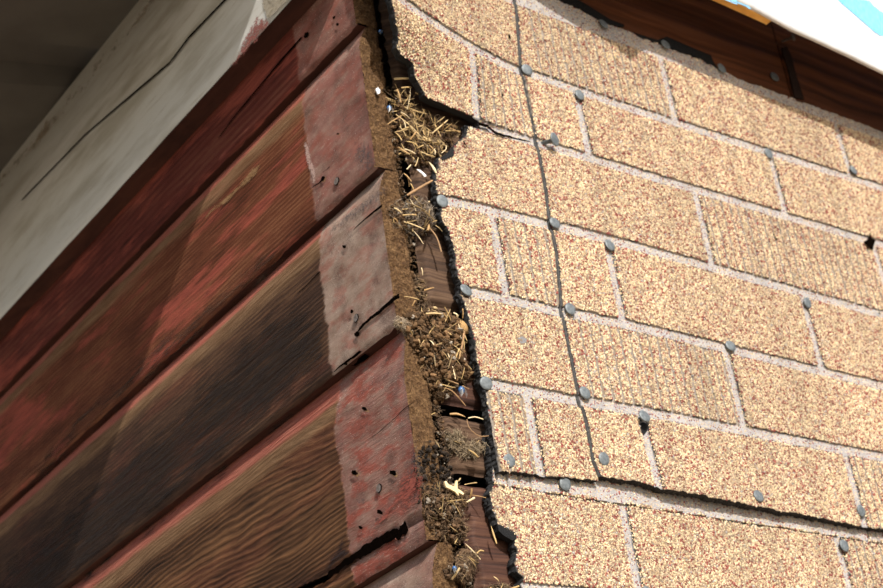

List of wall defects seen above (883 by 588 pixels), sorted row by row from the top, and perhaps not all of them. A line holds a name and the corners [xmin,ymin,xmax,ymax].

crack [478,122,530,142]
crack [334,294,400,372]
crack [298,521,408,588]